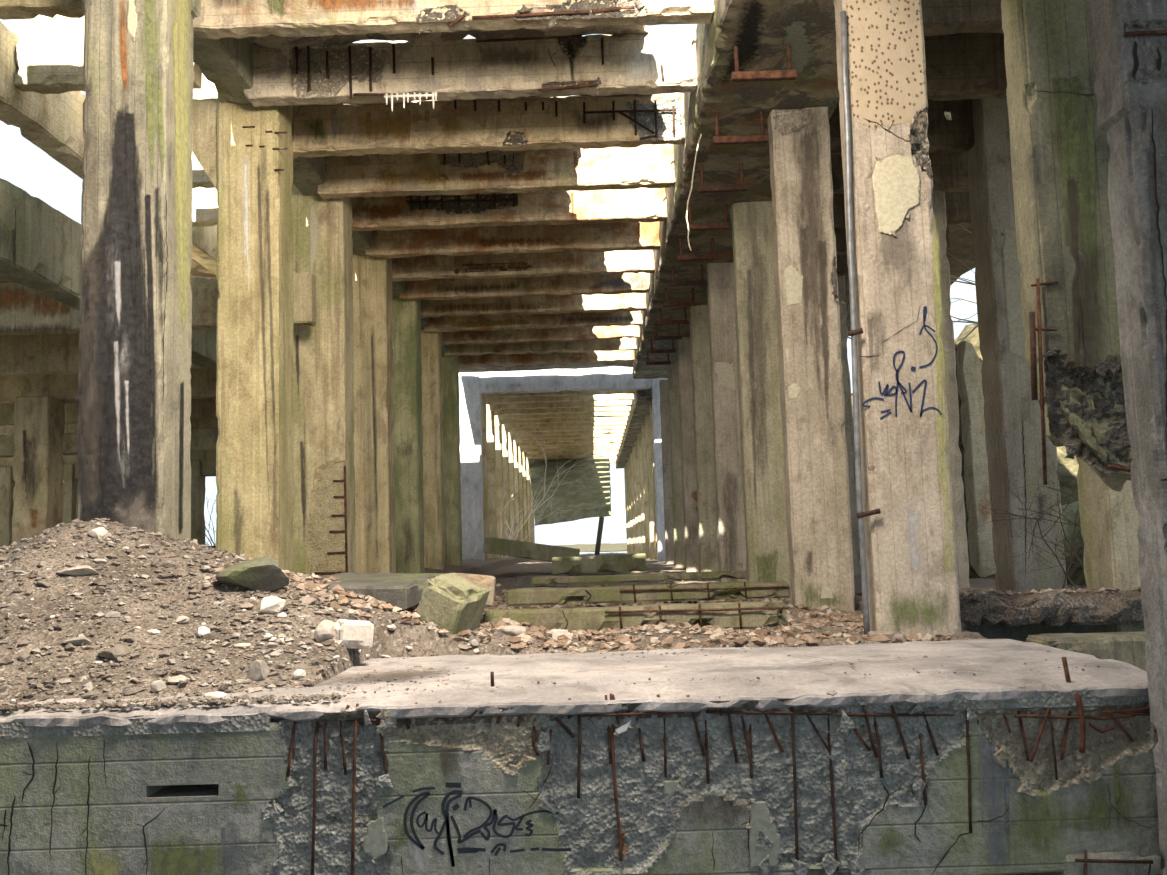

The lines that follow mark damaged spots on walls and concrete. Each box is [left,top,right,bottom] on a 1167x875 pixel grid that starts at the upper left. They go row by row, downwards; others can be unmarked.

corrosion [309,0,413,10]
spalling [416,0,648,60]
peeling [847,0,933,238]
corrosion [0,286,70,316]
leakage [84,23,183,488]
spalling [1001,227,1131,485]
leakage [1059,77,1099,420]
crack [1152,112,1167,481]
crack [0,740,106,875]
crack [137,806,167,875]
spalling [0,686,1164,875]
crack [914,805,1010,874]